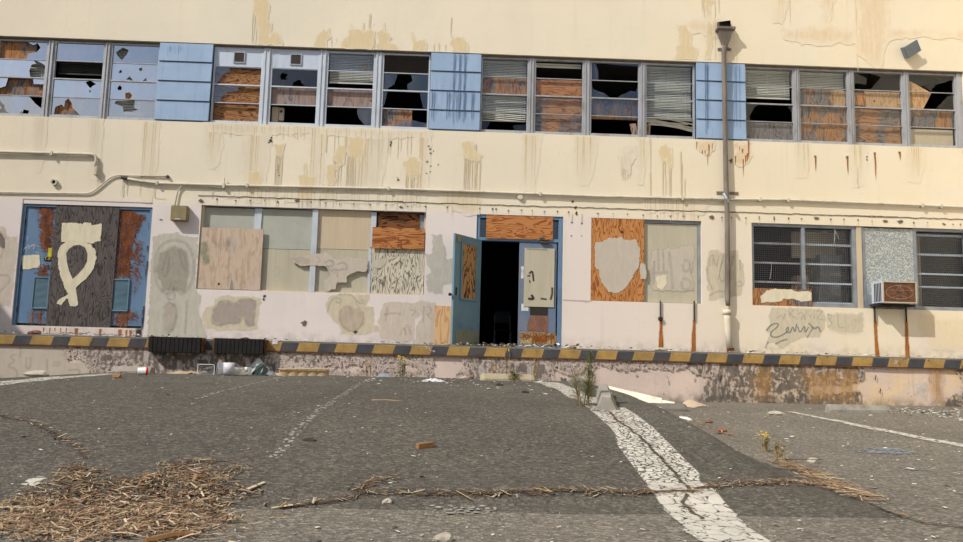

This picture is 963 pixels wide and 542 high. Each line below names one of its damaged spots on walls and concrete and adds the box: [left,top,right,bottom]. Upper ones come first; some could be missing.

water stain [251,0,283,46]
water stain [313,14,398,50]
water stain [411,17,469,53]
water stain [674,0,740,63]
water stain [202,122,493,217]
rust [695,139,716,164]
rust [730,140,753,174]